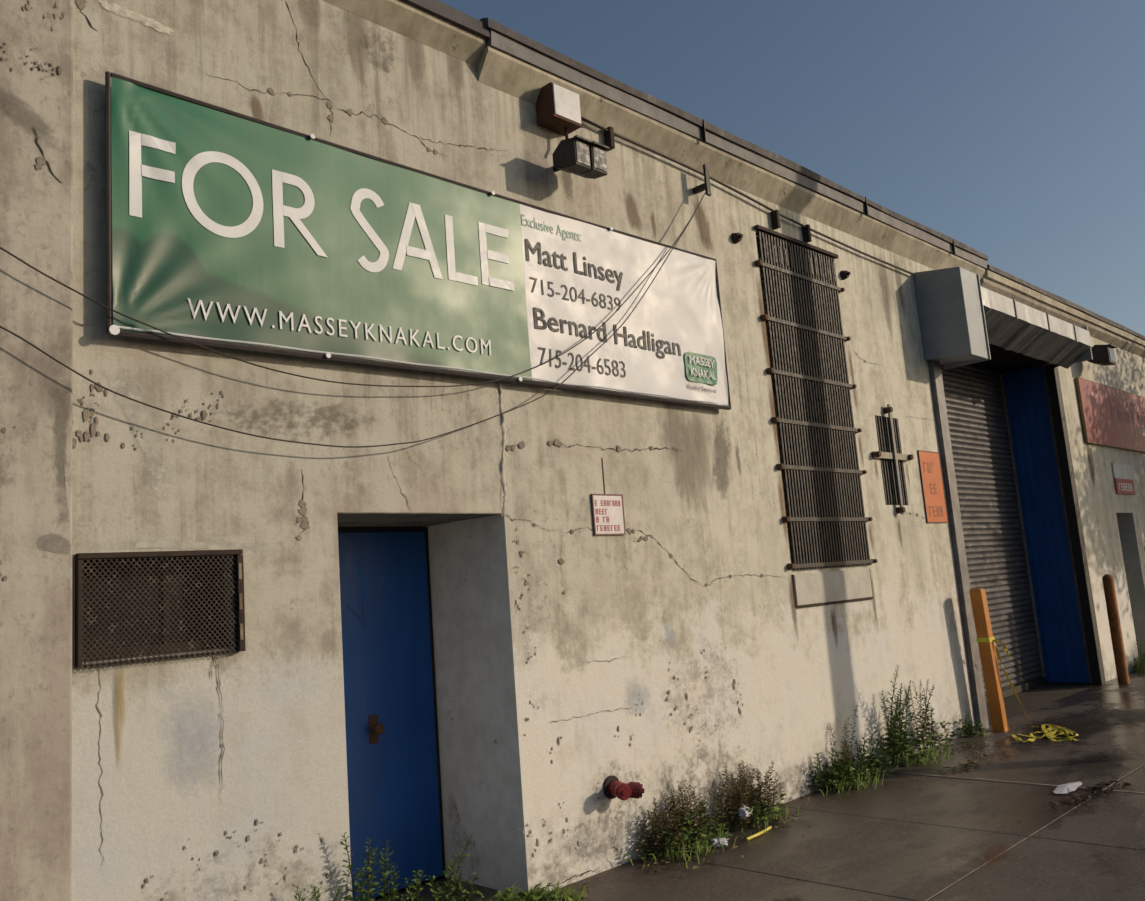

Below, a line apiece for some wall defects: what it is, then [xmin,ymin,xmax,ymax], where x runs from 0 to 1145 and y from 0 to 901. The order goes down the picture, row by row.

crack [208,1,508,155]
crack [32,127,63,183]
peeling [72,369,143,450]
peeling [163,391,224,443]
crack [506,439,682,452]
crack [507,515,592,600]
crack [627,528,778,587]
crack [95,668,104,865]
corrosion [116,678,124,752]
crack [211,655,225,804]